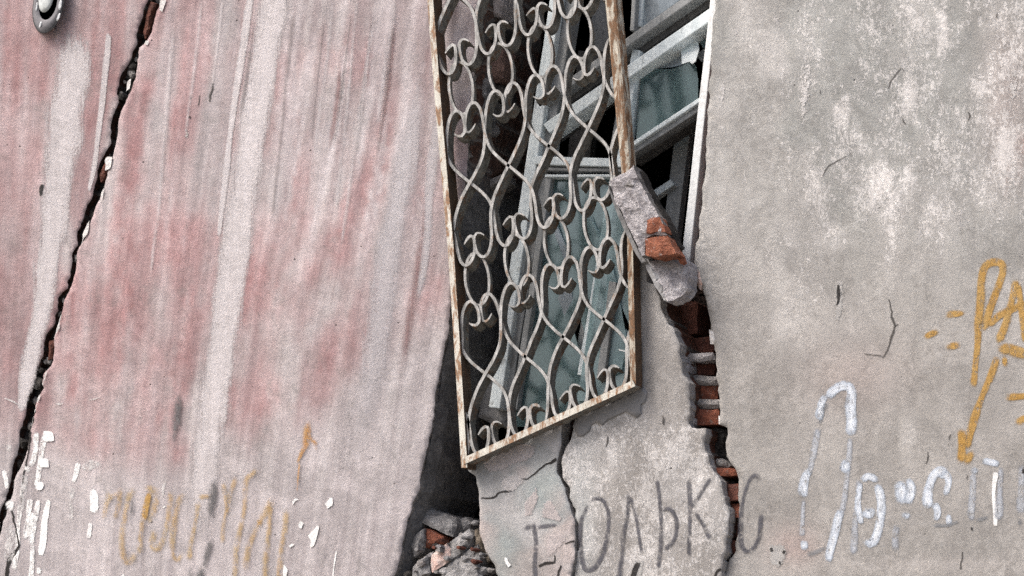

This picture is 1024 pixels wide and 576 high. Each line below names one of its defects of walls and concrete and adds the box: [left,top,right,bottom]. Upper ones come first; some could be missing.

crack [0,0,166,576]
crack [864,299,899,358]
crack [481,458,557,499]
crack [538,540,574,576]